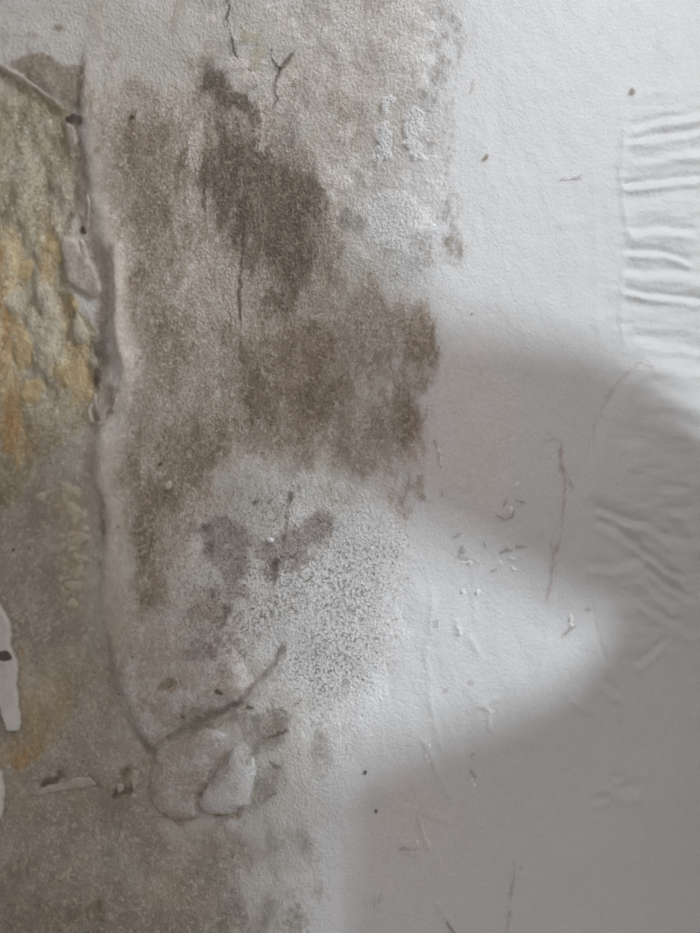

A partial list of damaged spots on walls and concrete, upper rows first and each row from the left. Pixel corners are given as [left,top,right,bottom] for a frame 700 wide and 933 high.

peeling [0,62,226,933]
damp [12,53,438,819]
crack [220,0,295,106]